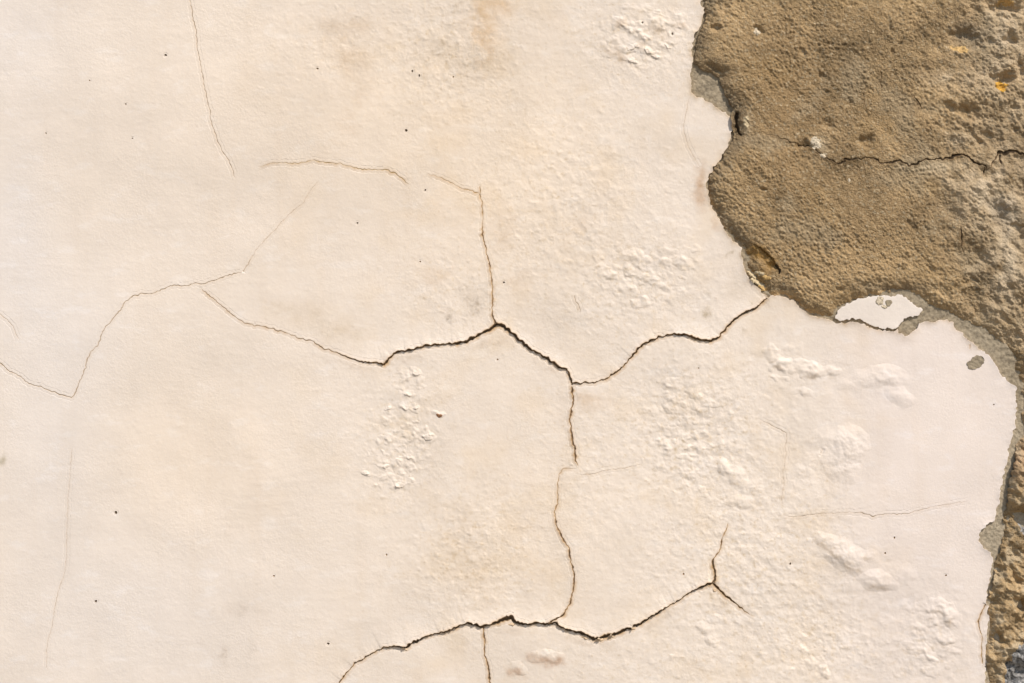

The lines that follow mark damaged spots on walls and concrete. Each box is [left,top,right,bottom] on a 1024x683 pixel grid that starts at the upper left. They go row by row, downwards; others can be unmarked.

crack [0,0,785,683]
spalling [694,0,1024,395]
crack [731,109,1024,177]
spalling [985,412,1024,683]